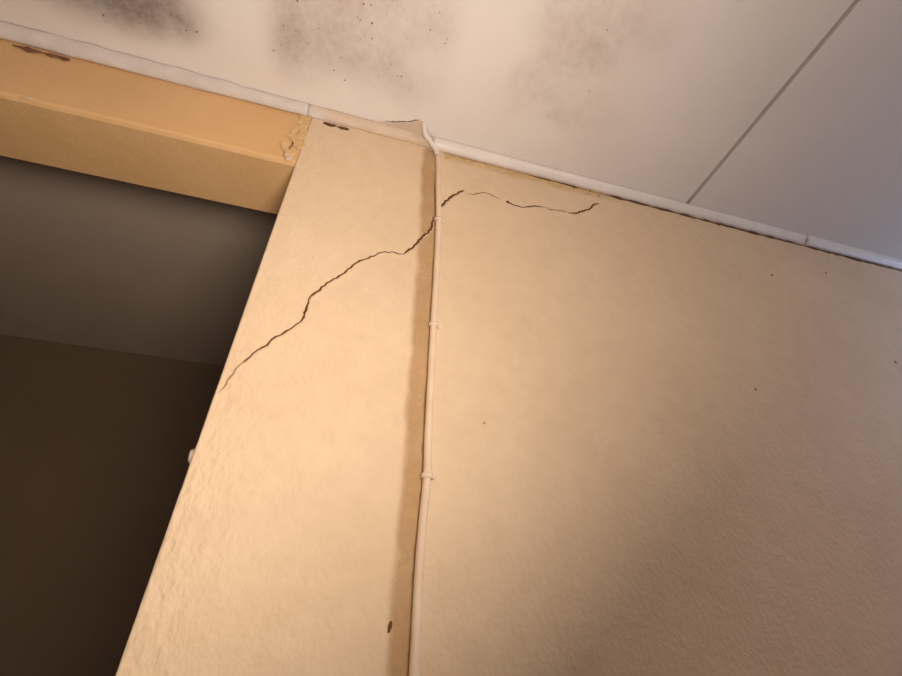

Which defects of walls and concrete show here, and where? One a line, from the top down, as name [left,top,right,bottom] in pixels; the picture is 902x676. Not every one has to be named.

crack [218,153,902,676]